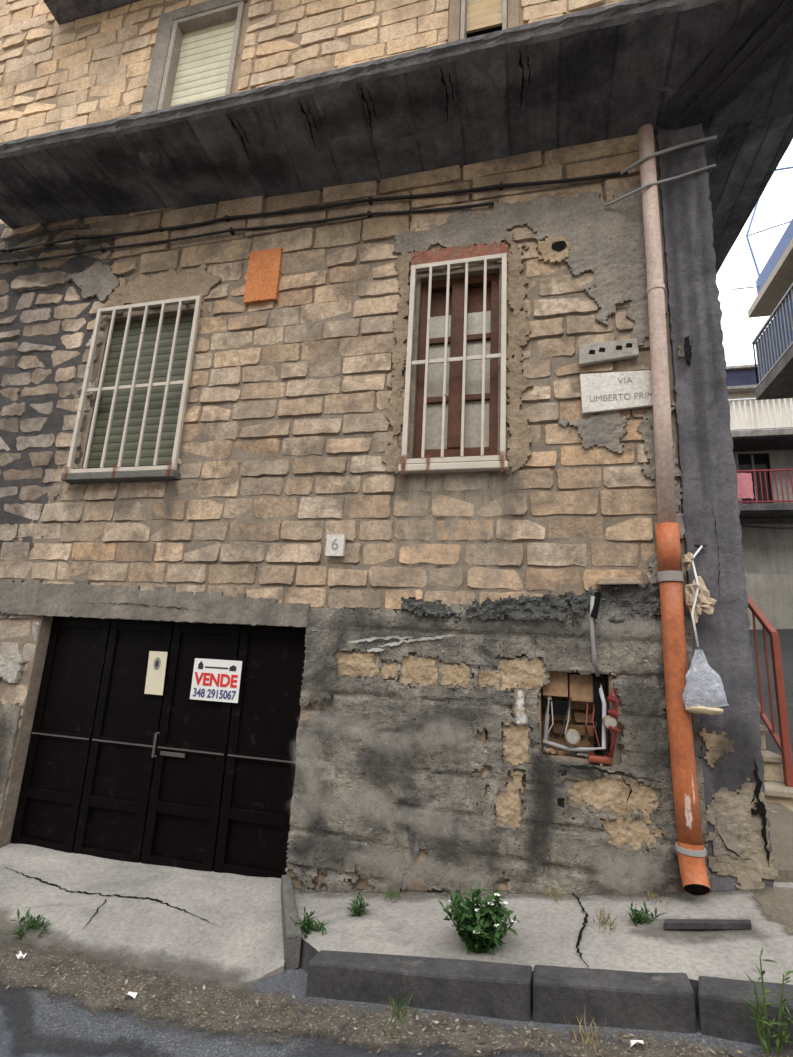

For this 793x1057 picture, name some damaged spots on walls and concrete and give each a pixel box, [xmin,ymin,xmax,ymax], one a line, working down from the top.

crack [519,50,530,107]
peeling [381,180,650,476]
peeling [0,222,123,550]
leakage [348,635,455,652]
leakage [596,613,656,634]
leakage [516,690,527,724]
flaking render [700,728,734,768]
flaking render [562,771,663,854]
flaking render [685,775,778,891]
crack [717,759,770,867]
crack [6,867,219,931]
crack [572,893,590,970]